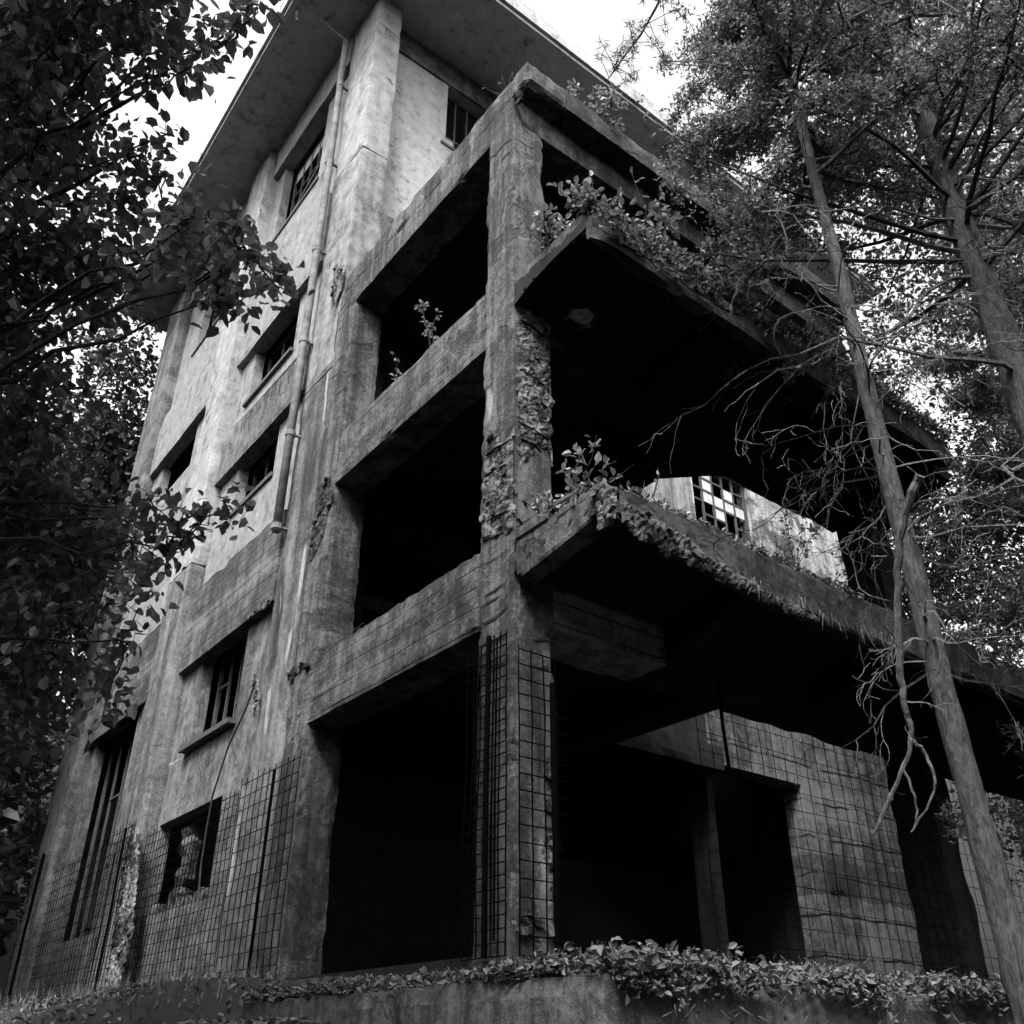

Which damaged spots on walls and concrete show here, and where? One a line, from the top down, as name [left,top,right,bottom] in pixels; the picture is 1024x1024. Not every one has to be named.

spalling [309,476,335,561]
spalling [479,306,818,621]